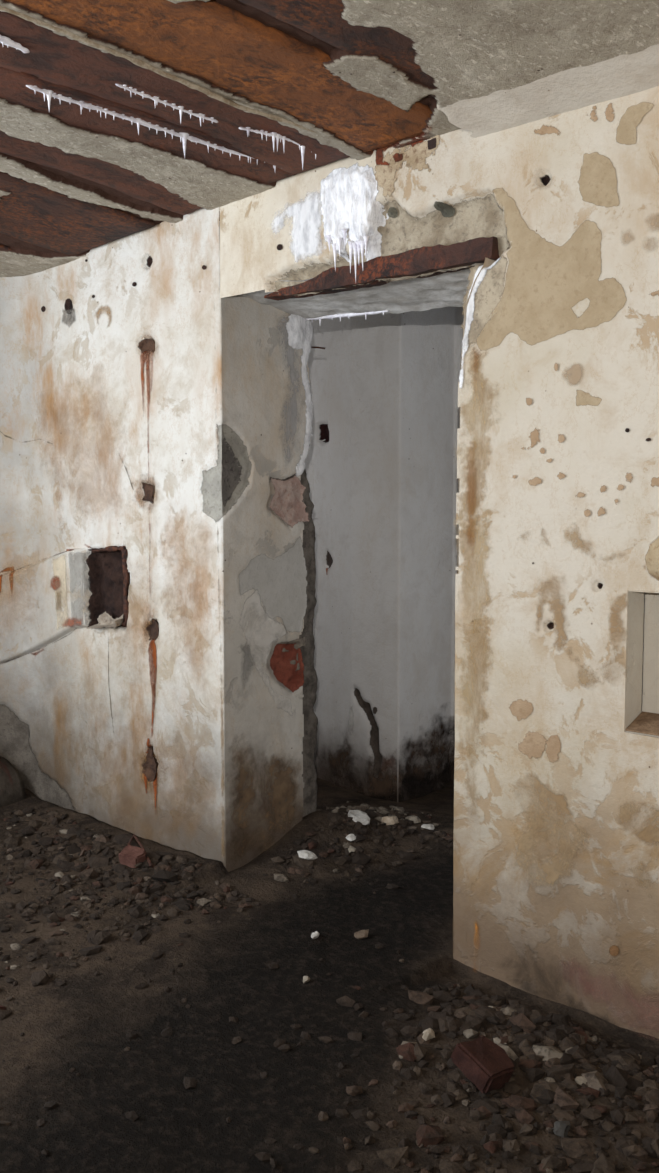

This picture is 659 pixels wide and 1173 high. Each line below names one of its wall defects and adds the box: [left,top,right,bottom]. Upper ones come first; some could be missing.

peeling [534,125,560,135]
peeling [590,102,654,145]
damp [272,163,389,281]
peeling [270,135,627,388]
corrosion [138,337,155,404]
spalling [201,424,251,522]
peeling [239,474,309,715]
damp [460,354,492,719]
corrosion [141,619,159,808]
damp [323,718,455,802]